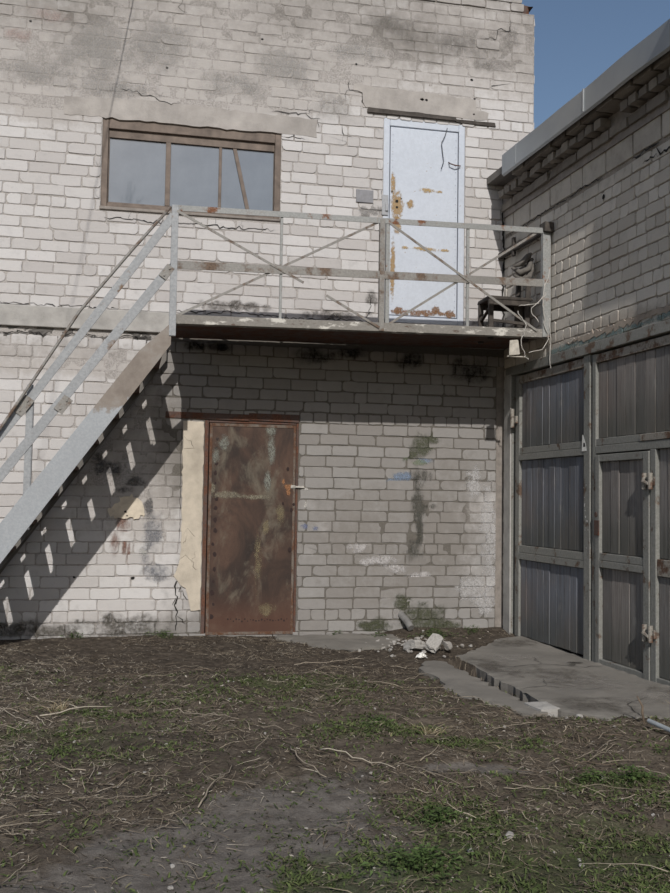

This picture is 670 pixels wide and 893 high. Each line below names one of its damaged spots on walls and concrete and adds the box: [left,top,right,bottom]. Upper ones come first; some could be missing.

crack [632,142,670,162]
leakage [406,450,434,556]
crack [172,529,197,630]